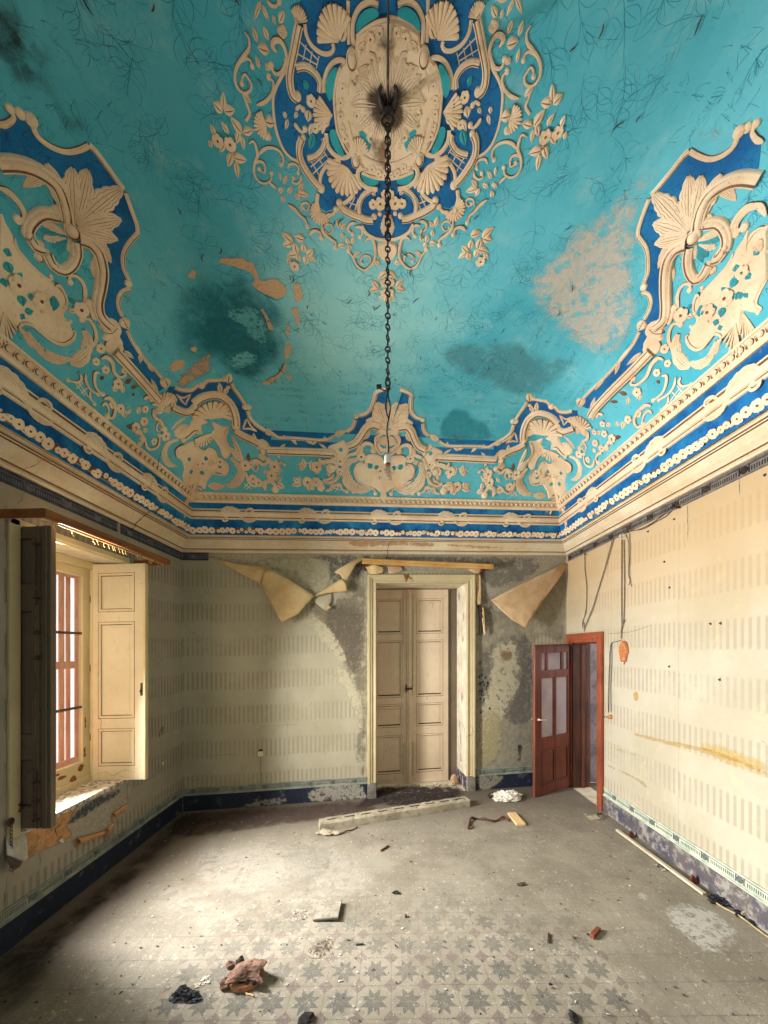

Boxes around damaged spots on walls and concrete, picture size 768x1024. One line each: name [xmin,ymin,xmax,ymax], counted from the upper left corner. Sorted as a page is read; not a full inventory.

peeling [170,347,213,388]
water stain [183,285,276,374]
peeling [219,248,312,387]
flaking render [212,541,567,625]
flaking render [21,780,132,859]